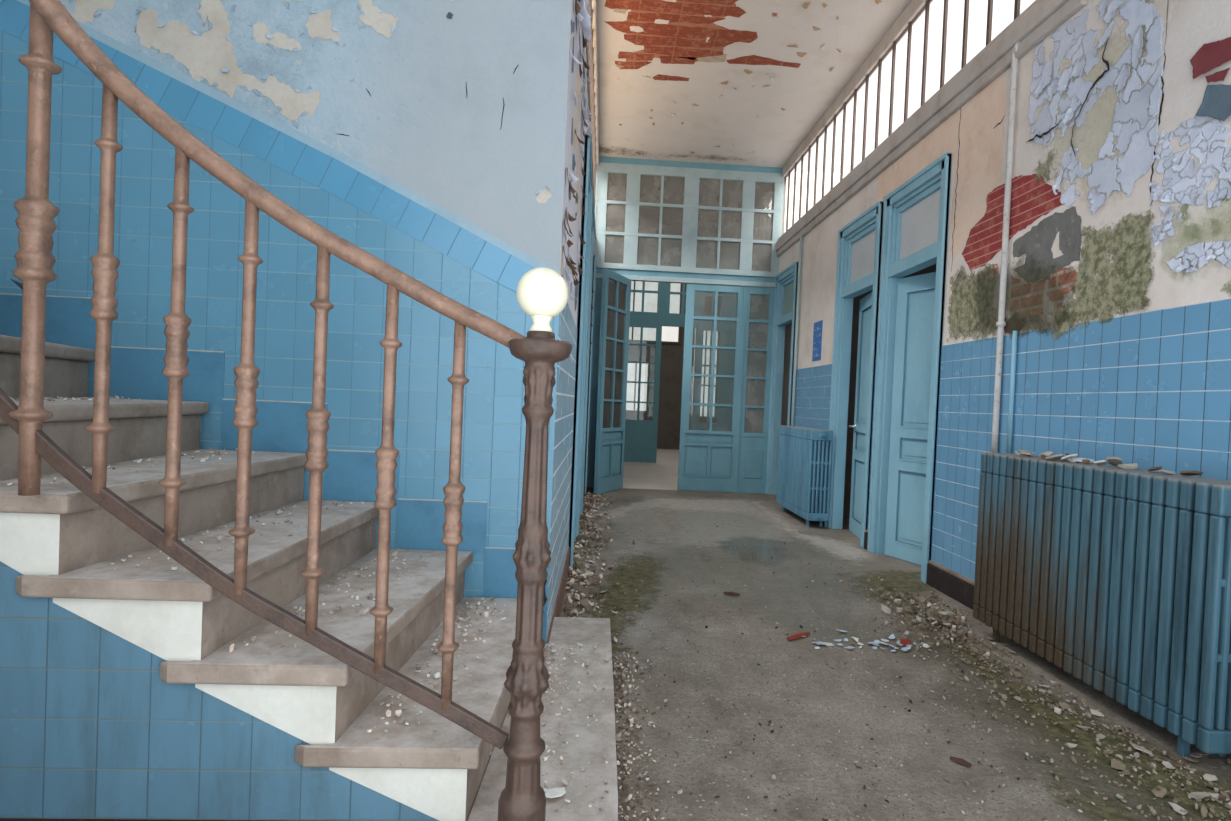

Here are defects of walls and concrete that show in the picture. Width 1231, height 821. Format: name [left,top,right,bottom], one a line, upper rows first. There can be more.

peeling [71,0,115,24]
peeling [135,0,322,129]
peeling [252,9,340,53]
peeling [358,0,398,38]
flaking render [561,0,807,362]
peeling [877,0,1231,310]